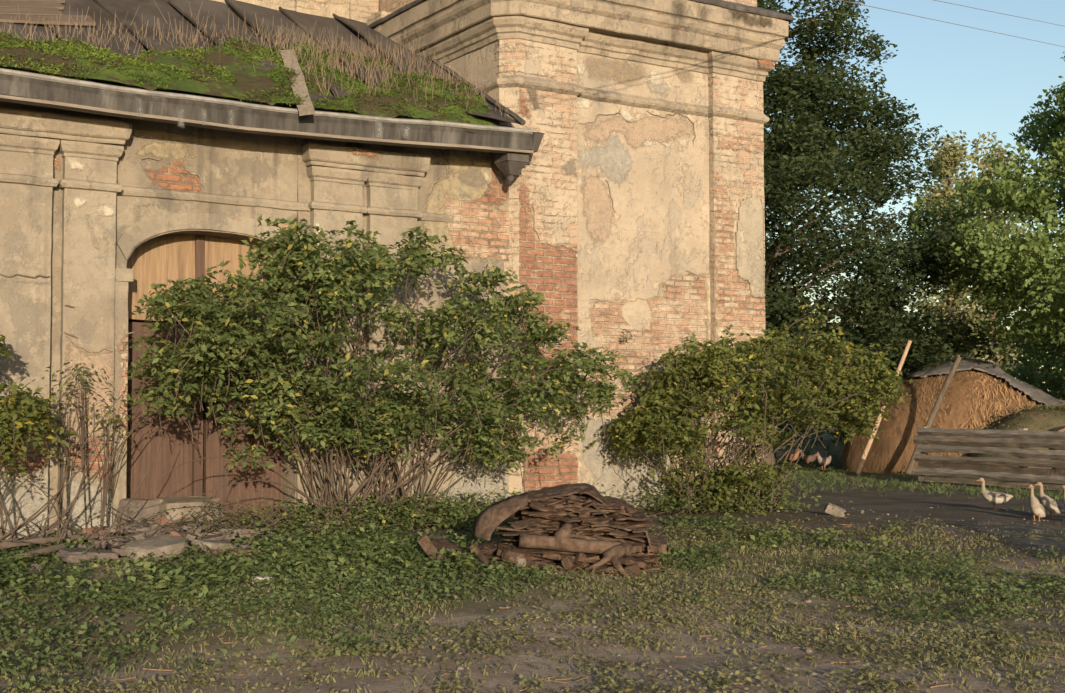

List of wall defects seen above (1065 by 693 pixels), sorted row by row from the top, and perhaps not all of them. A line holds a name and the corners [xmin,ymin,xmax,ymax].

spalling [519,88,539,118]
flaking render [136,140,203,193]
flaking render [716,131,764,153]
flaking render [419,149,766,418]